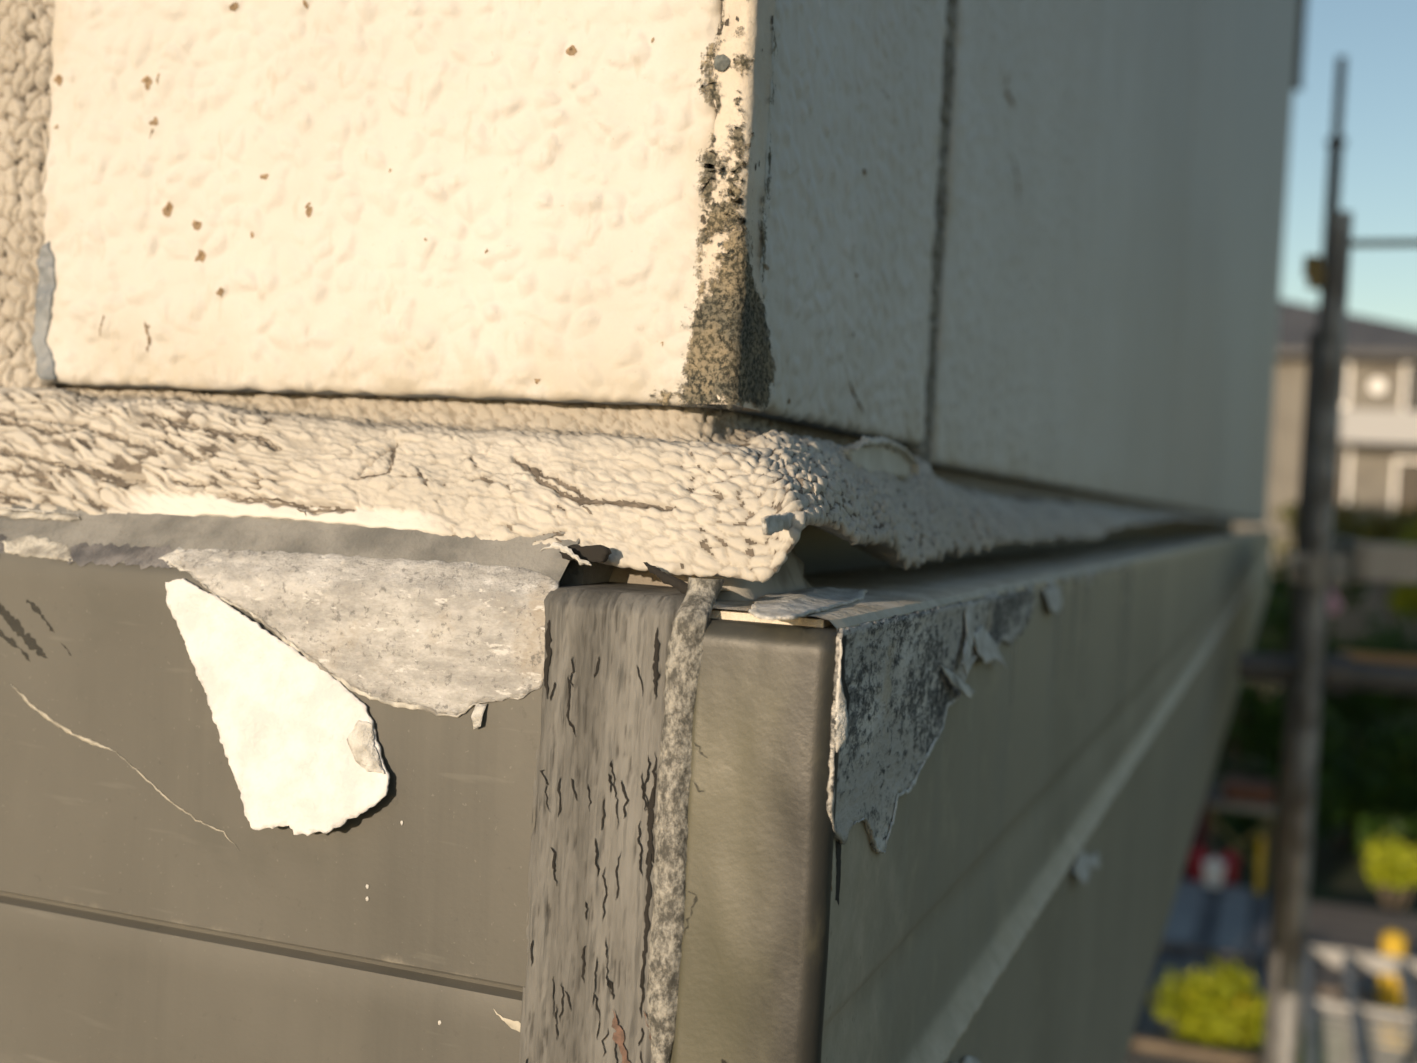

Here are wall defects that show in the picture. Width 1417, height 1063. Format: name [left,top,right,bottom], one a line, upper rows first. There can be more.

crack [0,6,1012,577]
damp [650,0,778,415]
peeling [159,547,559,836]
peeling [826,562,1132,854]
peeling [1073,847,1100,888]